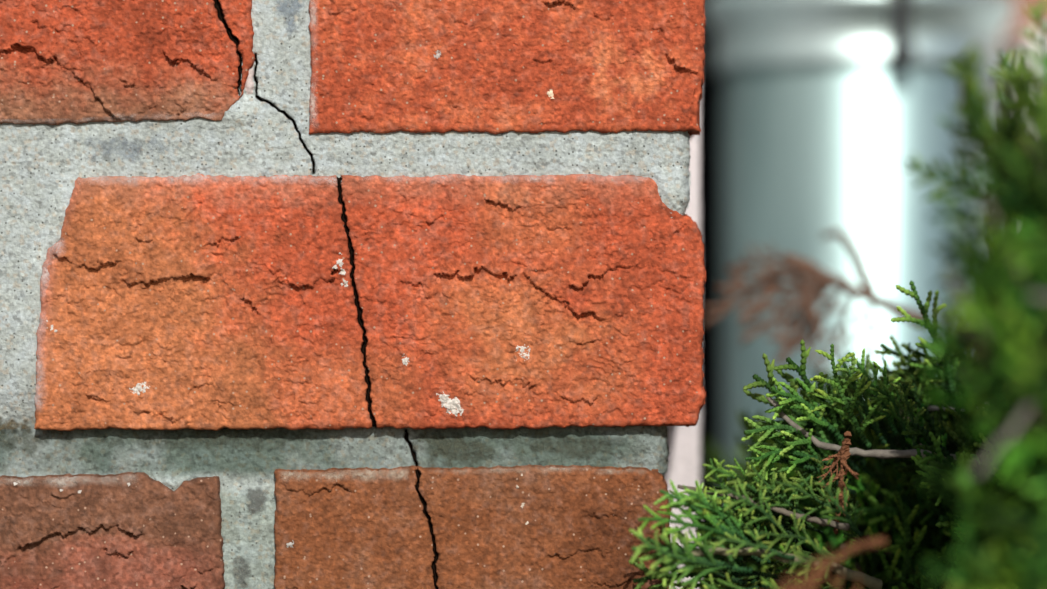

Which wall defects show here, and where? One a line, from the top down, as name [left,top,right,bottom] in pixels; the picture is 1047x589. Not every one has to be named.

crack [214,0,376,427]
crack [404,430,439,589]